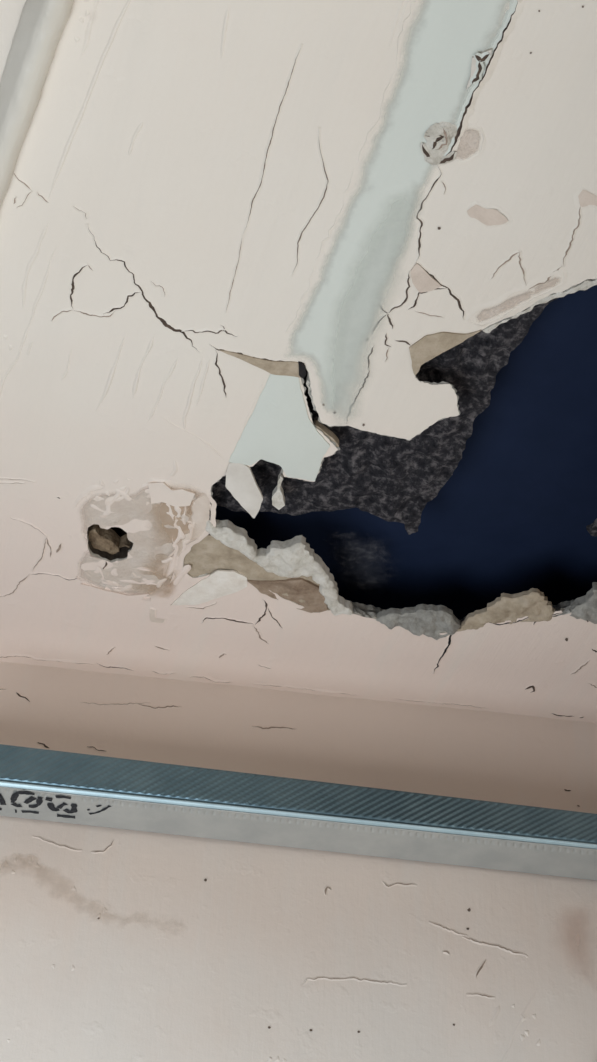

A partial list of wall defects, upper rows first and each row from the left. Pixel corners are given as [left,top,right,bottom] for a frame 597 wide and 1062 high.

crack [12,43,306,398]
crack [289,127,330,277]
crack [345,0,525,424]
peeling [466,201,513,227]
spalling [409,268,597,415]
spalling [73,366,597,640]
crack [185,598,283,644]
crack [432,635,453,674]